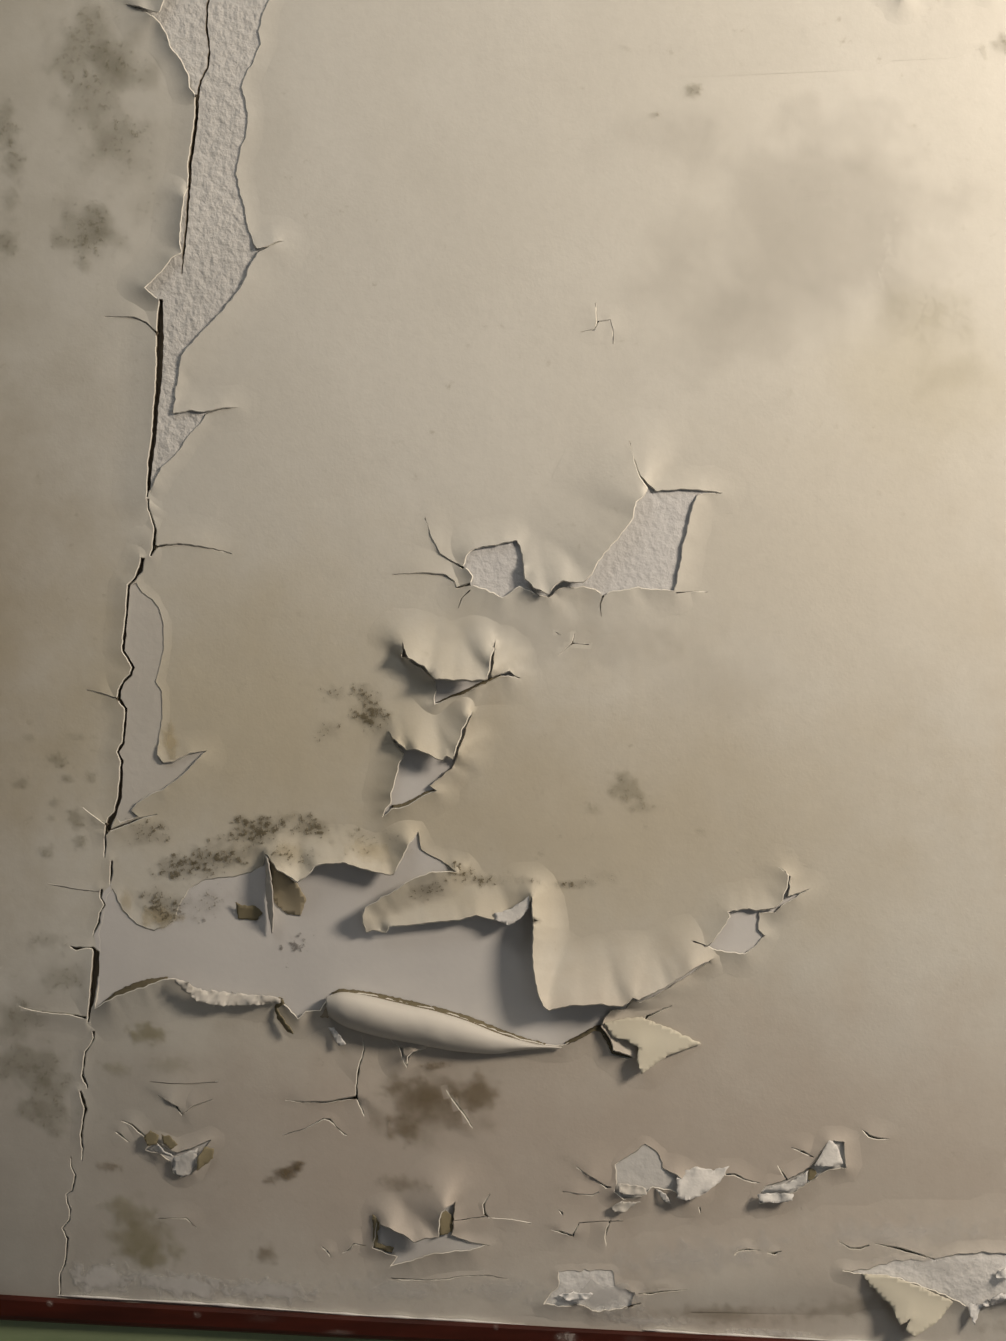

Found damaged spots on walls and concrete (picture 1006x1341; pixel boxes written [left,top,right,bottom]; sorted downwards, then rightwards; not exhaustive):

peeling [868,0,1003,25]
peeling [104,0,310,501]
crack [9,0,248,1299]
peeling [90,406,831,1089]
damp [133,813,324,922]
peeling [137,1126,225,1188]
peeling [597,1135,729,1220]
peeling [745,1126,863,1219]
peeling [531,1263,647,1326]
peeling [829,1239,1006,1341]